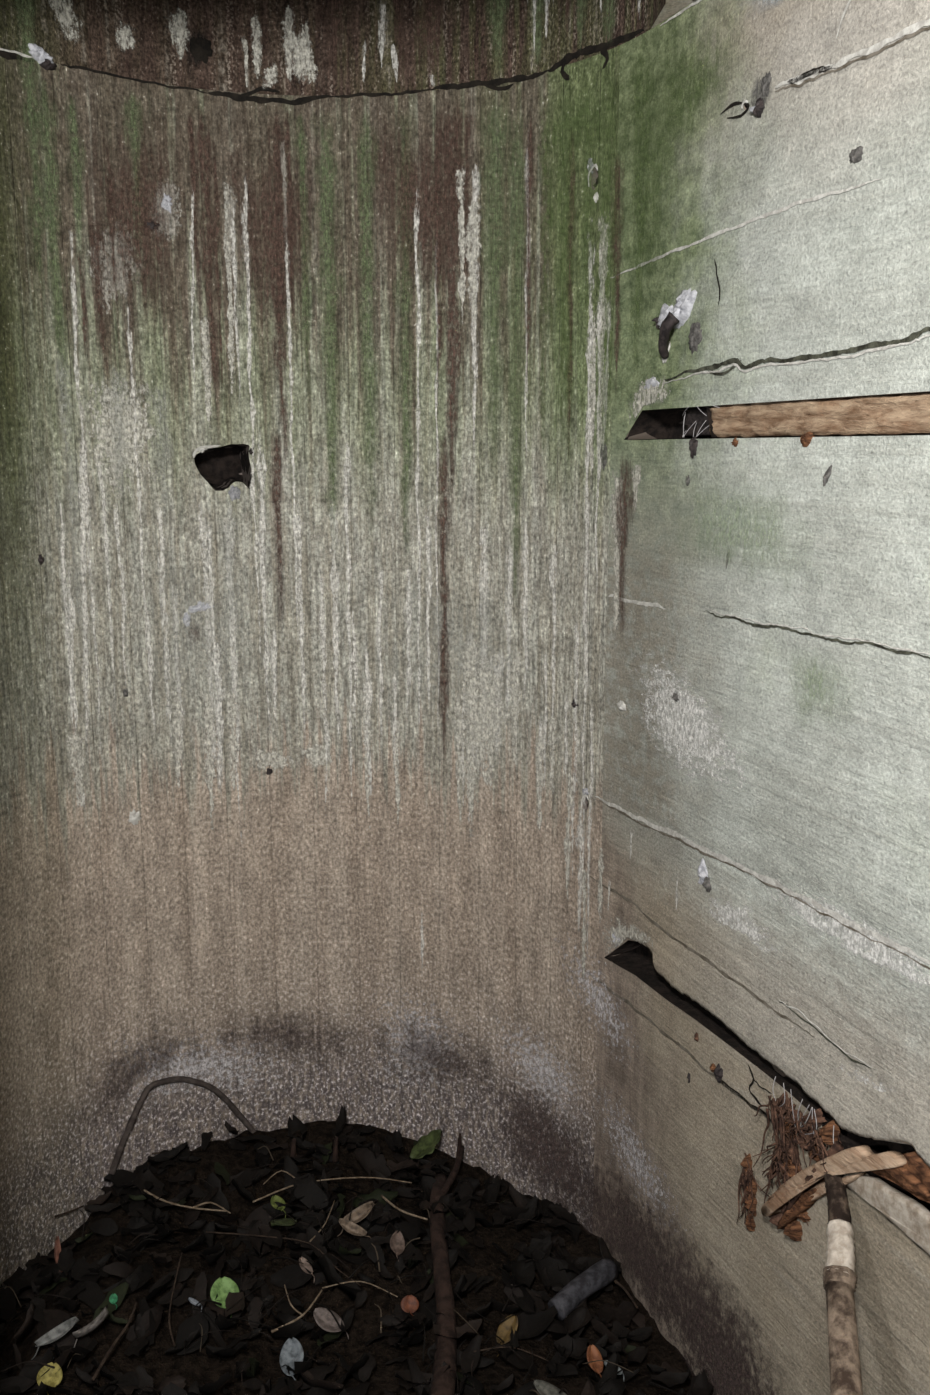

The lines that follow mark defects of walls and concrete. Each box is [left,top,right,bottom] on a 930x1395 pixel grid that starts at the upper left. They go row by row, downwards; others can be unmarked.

crack [0,29,644,105]
spalling [0,0,666,96]
damp [533,0,549,62]
crack [664,327,930,384]
damp [16,0,533,836]
spalling [192,444,253,501]
crack [705,607,930,659]
damp [369,139,777,1395]
damp [83,1012,342,1119]
crack [721,1065,771,1122]
crack [779,1000,872,1069]